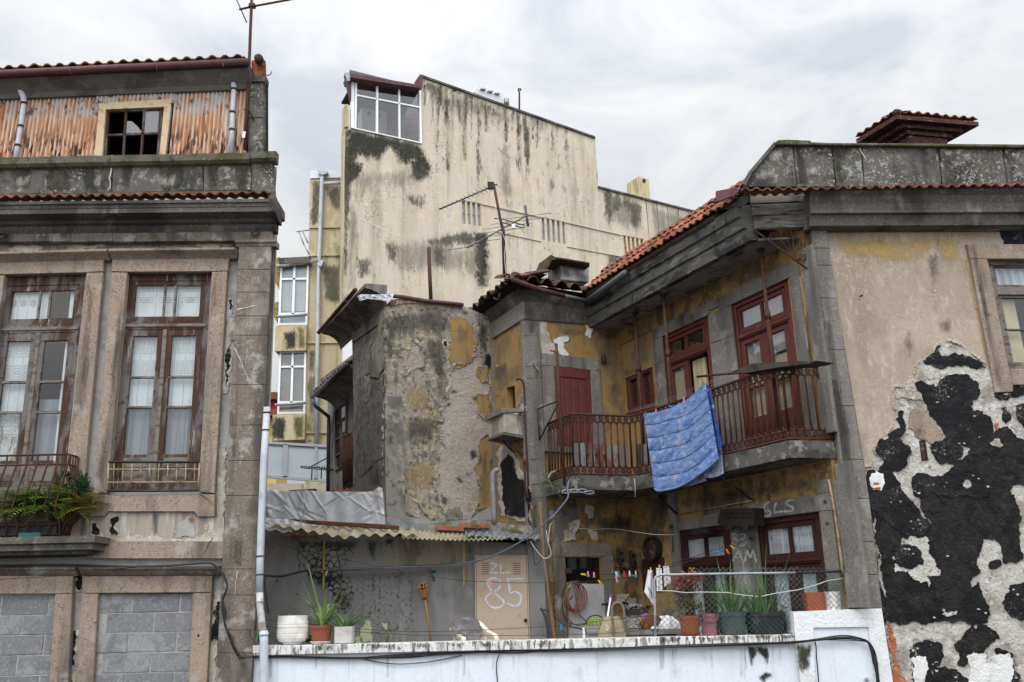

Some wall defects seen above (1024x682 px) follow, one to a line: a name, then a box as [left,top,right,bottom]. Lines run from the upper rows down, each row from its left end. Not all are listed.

leakage [311,129,431,301]
leakage [604,191,641,226]
leakage [429,232,489,286]
peeling [539,321,571,356]
spalling [434,317,533,523]
flaking render [90,445,228,541]
spalling [547,504,600,543]
spalling [864,338,1024,682]
flaking render [212,588,221,624]